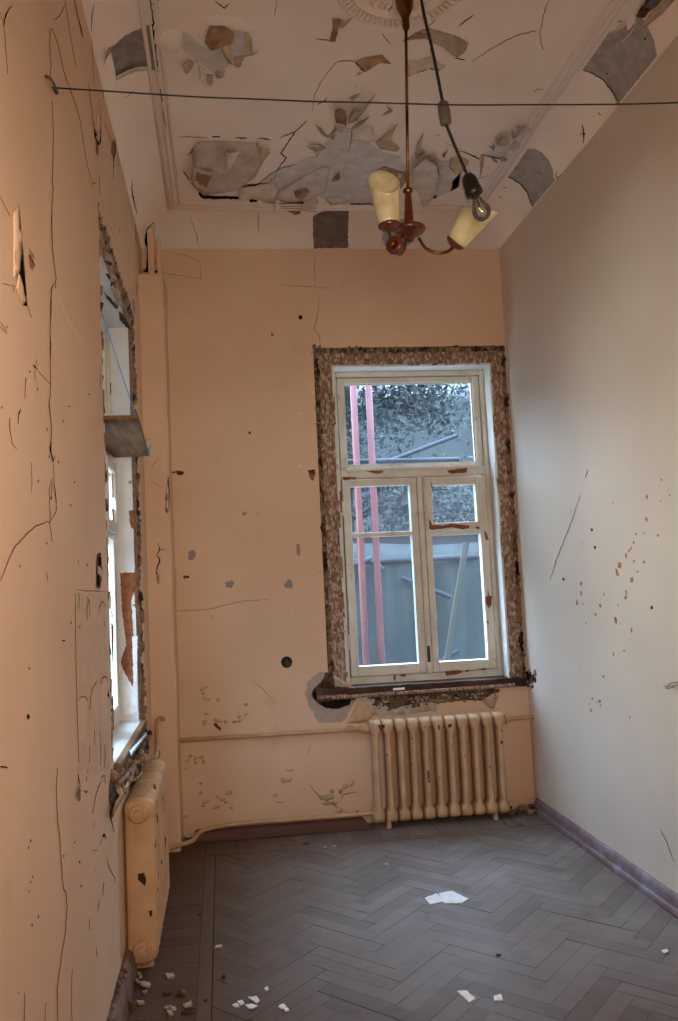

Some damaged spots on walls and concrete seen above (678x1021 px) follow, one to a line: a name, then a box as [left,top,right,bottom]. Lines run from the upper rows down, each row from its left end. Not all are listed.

peeling [105,15,259,86]
peeling [315,17,353,42]
peeling [342,55,391,76]
peeling [403,20,468,60]
crack [473,1,549,61]
peeling [583,0,675,103]
peeling [183,93,555,249]
crack [0,0,134,581]
spalling [300,344,536,725]
peeling [614,517,648,633]
crack [18,768,115,1021]